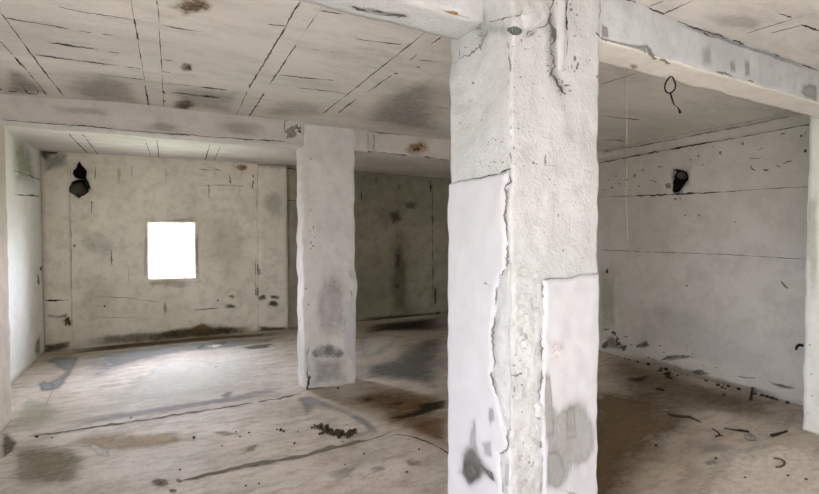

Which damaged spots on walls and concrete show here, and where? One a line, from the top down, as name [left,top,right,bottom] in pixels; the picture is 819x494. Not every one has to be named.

crack [0,1,224,105]
crack [236,0,568,116]
spalling [69,162,90,198]
spalling [650,169,689,193]
flaking render [494,259,543,494]
leakage [545,378,593,487]